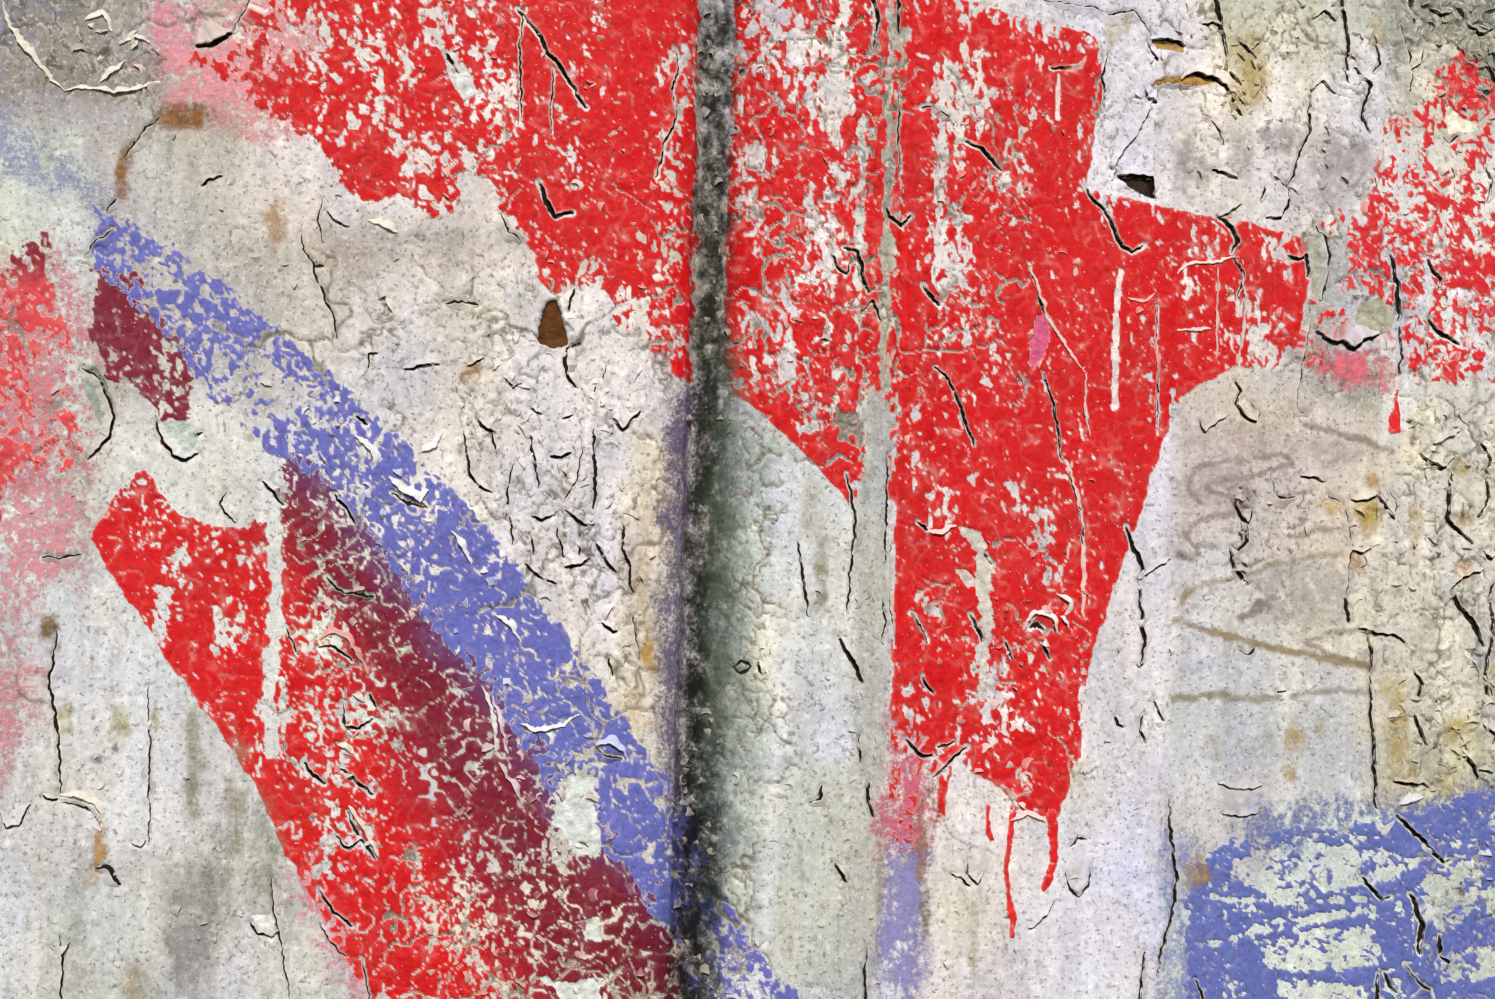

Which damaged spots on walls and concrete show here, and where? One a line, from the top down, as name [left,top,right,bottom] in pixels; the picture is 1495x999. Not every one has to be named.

peeling [2,1,161,93]
crack [1044,0,1154,253]
peeling [1117,154,1166,198]
peeling [1135,2,1299,151]
crack [1128,0,1423,425]
crack [1389,253,1461,376]
peeling [301,387,432,547]
peeling [451,286,668,698]
water stain [672,0,745,999]
peeling [1347,413,1495,795]
crack [0,630,152,887]
crack [1368,676,1450,863]